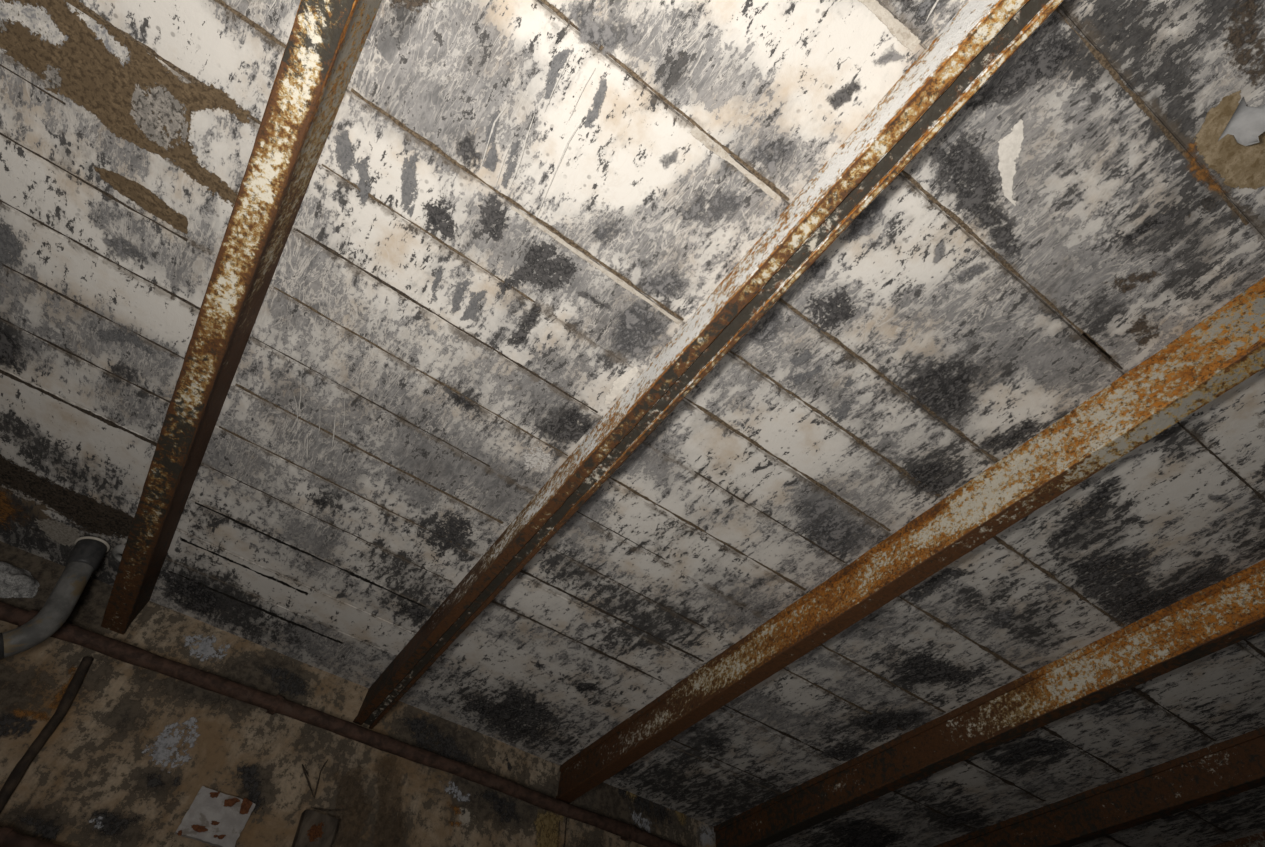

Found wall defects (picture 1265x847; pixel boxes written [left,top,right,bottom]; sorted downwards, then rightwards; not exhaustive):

peeling [0,0,251,207]
peeling [93,165,188,234]
leakage [335,131,371,209]
leakage [401,153,460,246]
leakage [456,111,521,242]
leakage [544,3,641,99]
leakage [583,72,607,128]
leakage [827,81,860,110]
leakage [929,28,1082,282]
flaking render [1186,90,1265,198]
leakage [431,241,688,357]
leakage [805,258,857,333]